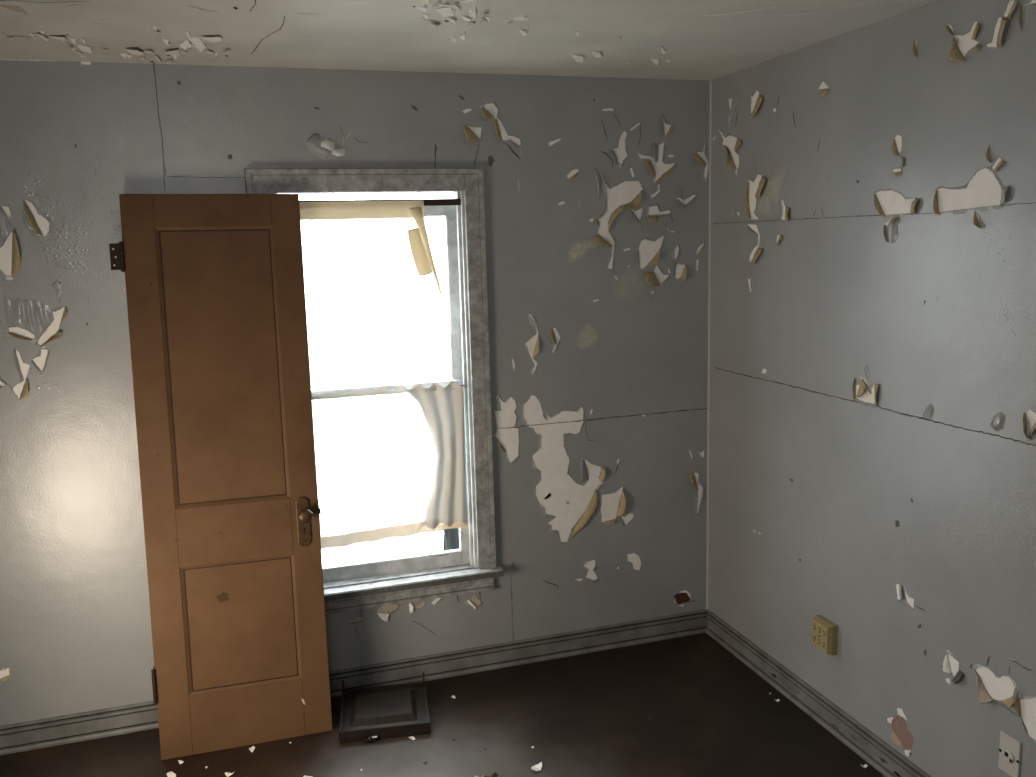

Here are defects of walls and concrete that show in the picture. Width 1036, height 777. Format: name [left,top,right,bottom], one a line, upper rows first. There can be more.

peeling [947,0,1036,62]
peeling [458,95,523,160]
peeling [0,231,20,280]
peeling [0,199,54,238]
peeling [589,112,705,298]
peeling [694,90,766,293]
peeling [873,134,919,244]
peeling [933,145,1009,229]
peeling [0,306,67,400]
crack [715,367,1036,446]
peeling [492,394,635,542]
peeling [943,649,1036,742]